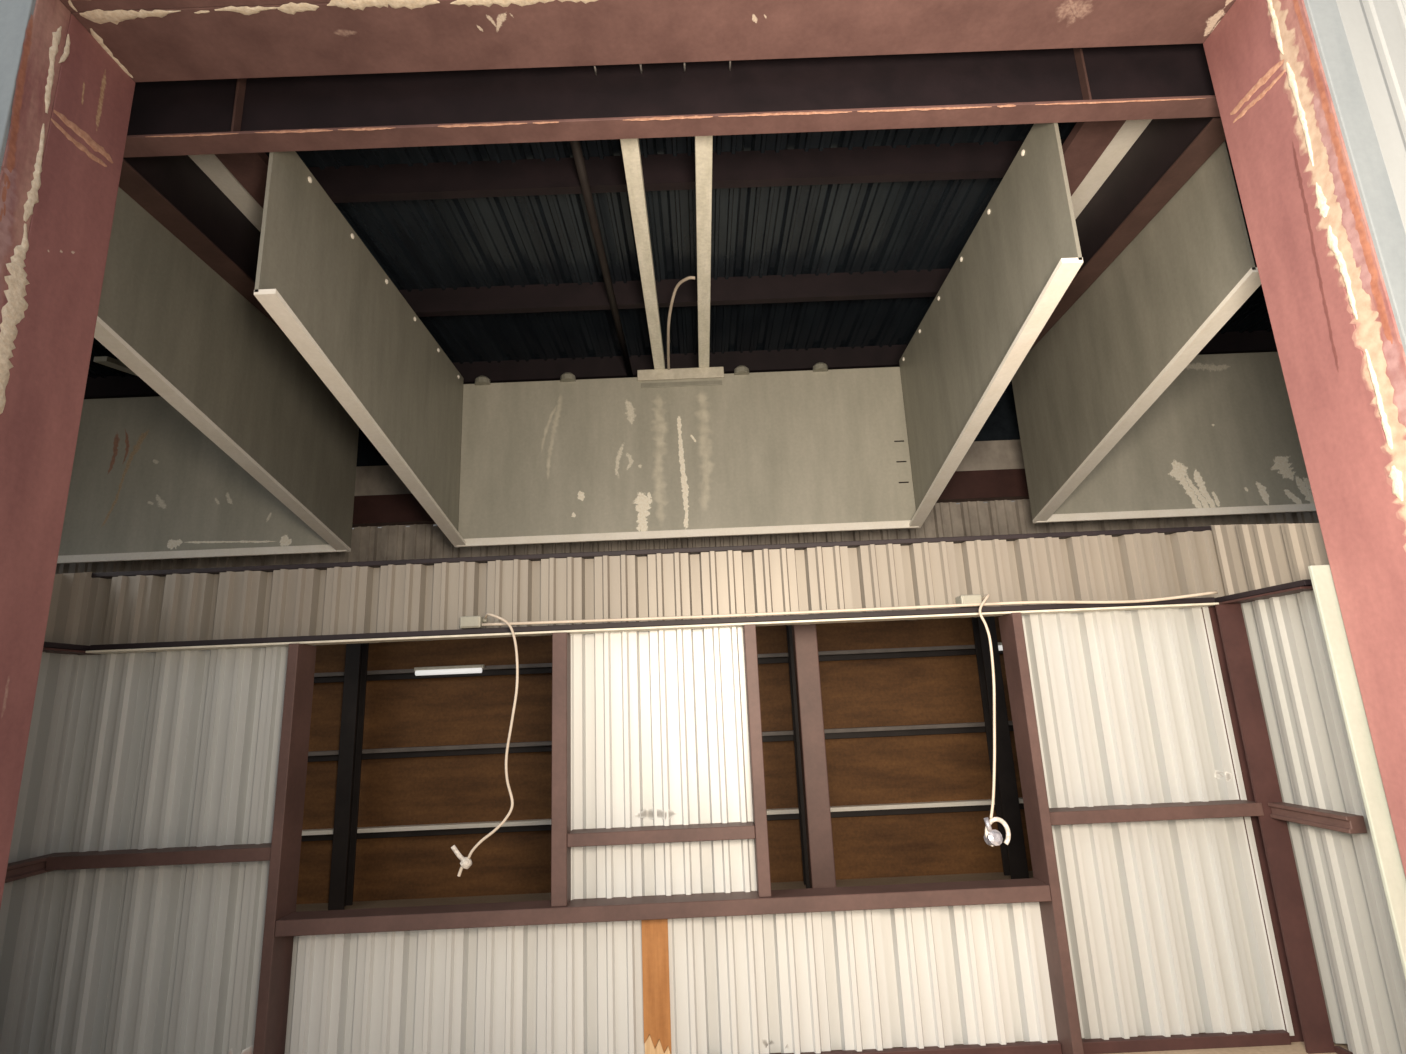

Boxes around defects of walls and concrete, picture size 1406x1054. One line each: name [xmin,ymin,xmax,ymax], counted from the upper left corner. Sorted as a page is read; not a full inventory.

peeling [68,0,598,78]
peeling [1203,0,1234,38]
peeling [146,127,395,137]
peeling [623,104,1016,121]
peeling [0,26,113,414]
peeling [1230,0,1406,552]